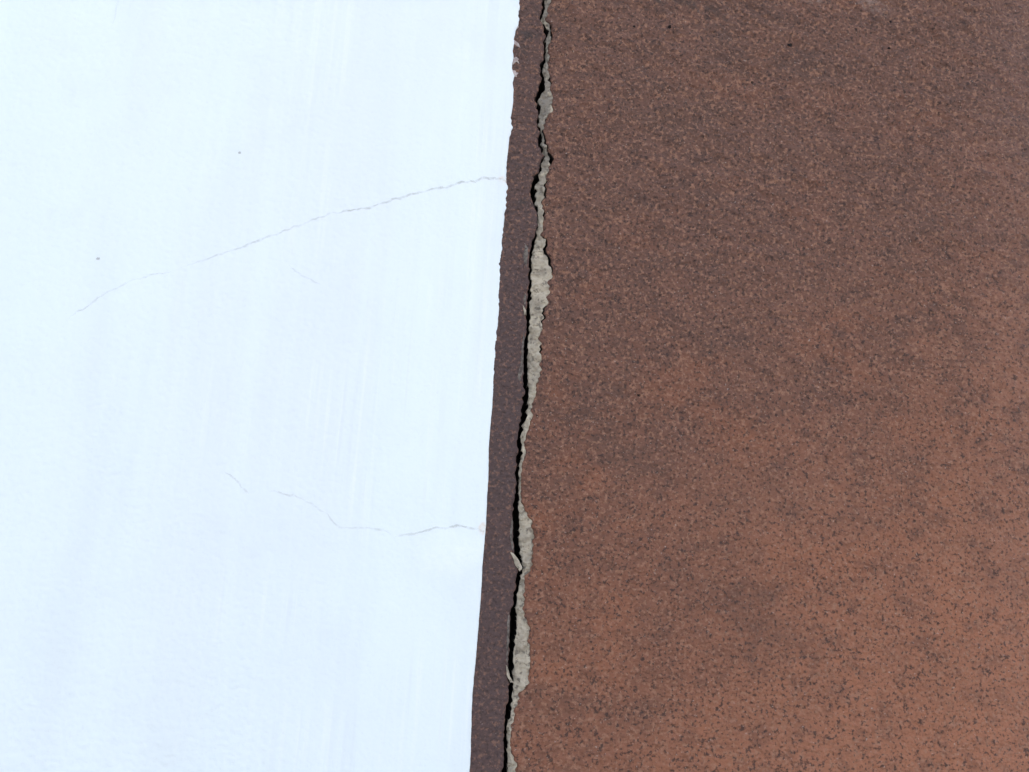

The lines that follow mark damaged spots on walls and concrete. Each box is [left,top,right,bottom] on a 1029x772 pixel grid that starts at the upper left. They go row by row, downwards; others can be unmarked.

crack [501,0,554,772]